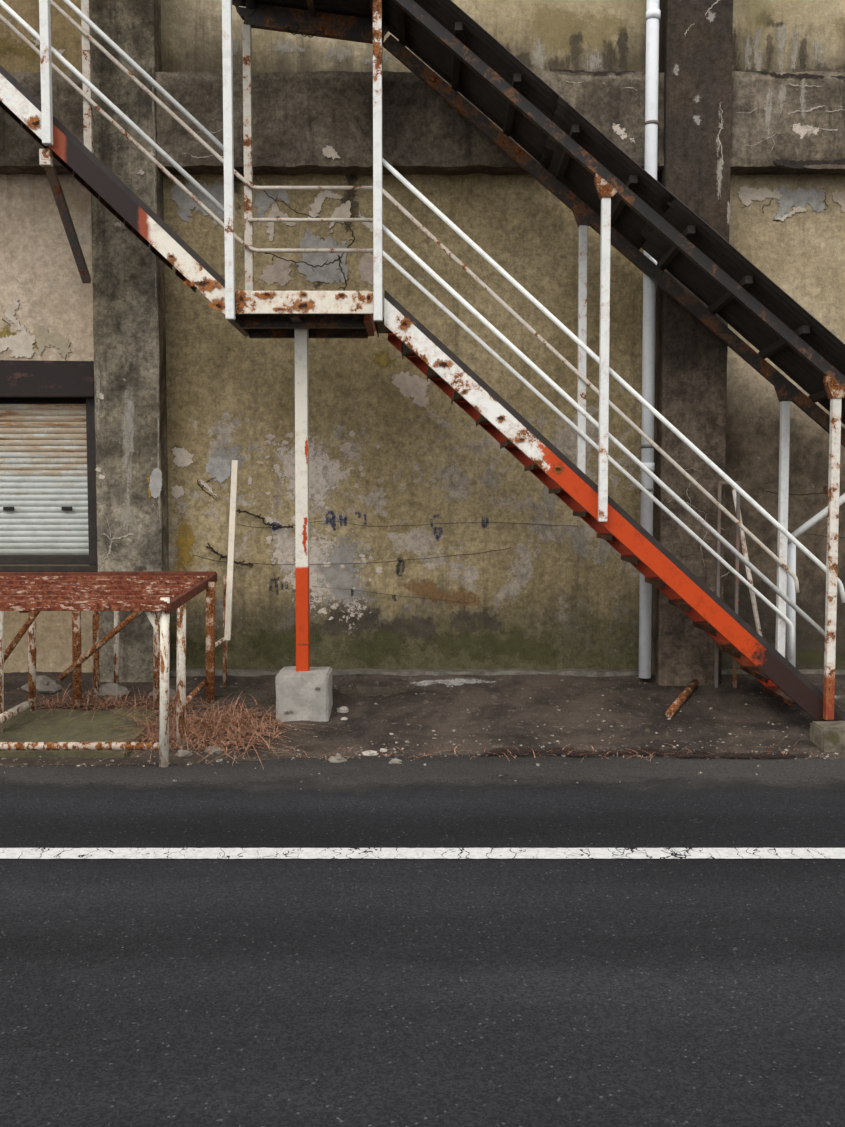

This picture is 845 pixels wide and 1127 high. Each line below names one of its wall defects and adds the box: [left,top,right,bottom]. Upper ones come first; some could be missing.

water stain [502,27,629,73]
water stain [732,10,845,138]
corrosion [24,115,41,130]
peeling [171,180,224,225]
peeling [738,184,845,221]
peeling [254,190,373,286]
corrosion [183,277,225,311]
water stain [311,600,440,641]
water stain [449,609,503,634]